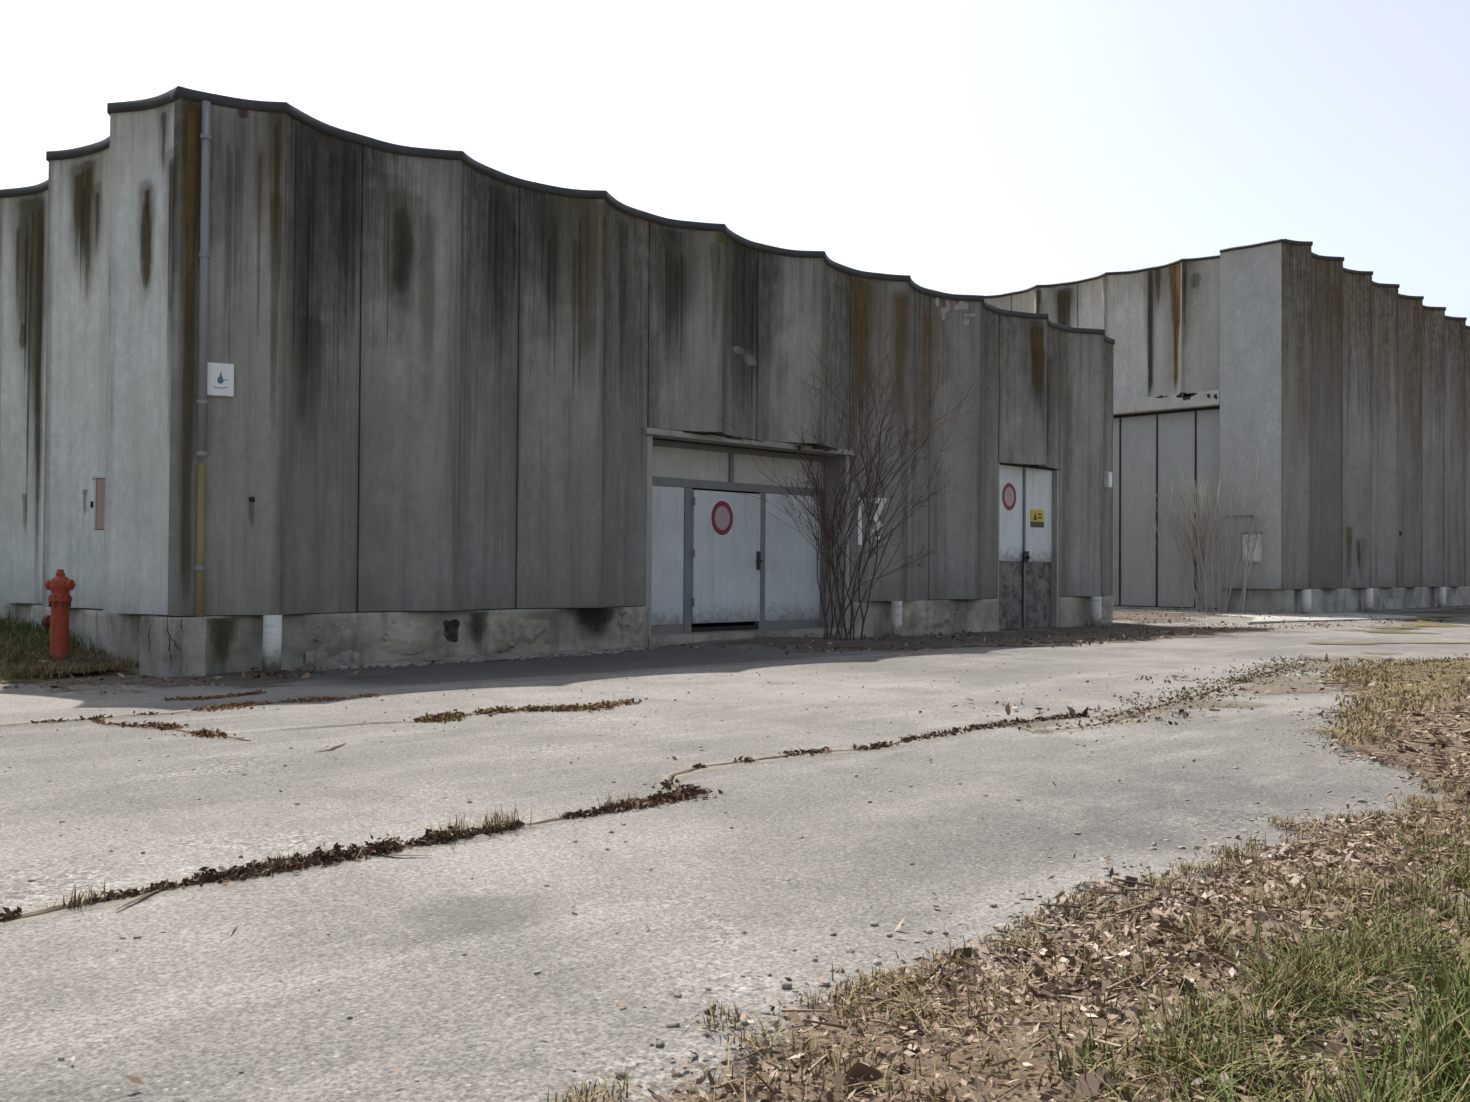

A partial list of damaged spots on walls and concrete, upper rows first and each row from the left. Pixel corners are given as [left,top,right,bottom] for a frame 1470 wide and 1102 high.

leakage [74,170,92,265]
leakage [396,209,412,289]
leakage [17,197,44,503]
corrosion [1170,262,1186,384]
crack [148,619,183,672]